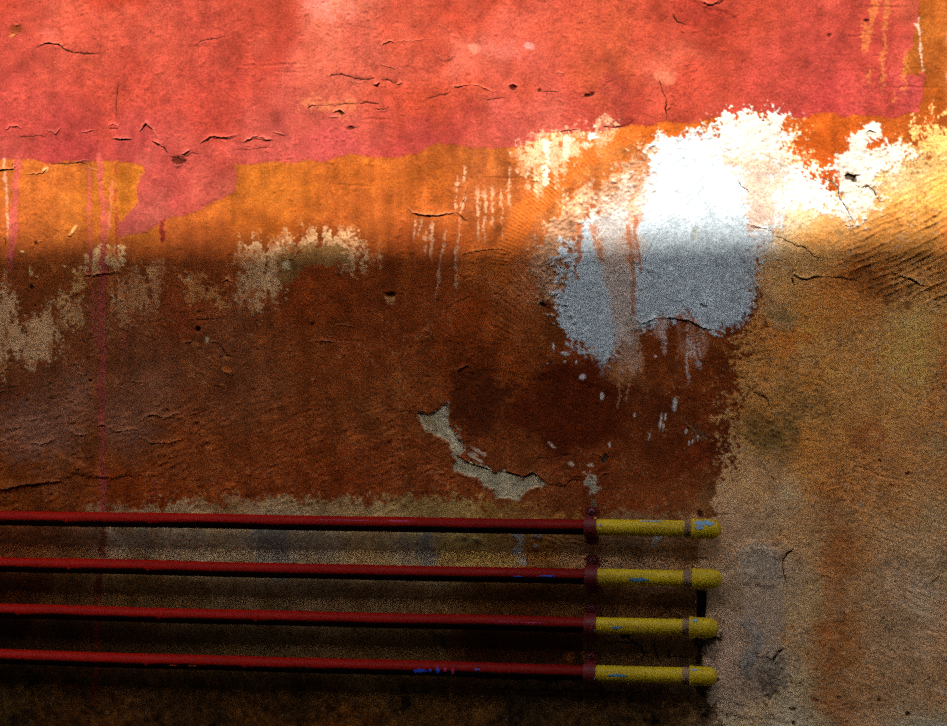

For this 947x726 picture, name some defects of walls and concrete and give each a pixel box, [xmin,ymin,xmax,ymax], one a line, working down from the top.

peeling [26,158,98,174]
peeling [106,81,285,169]
damp [0,151,194,512]
flaking render [0,215,385,388]
crack [893,271,926,287]
flaking render [400,401,549,503]